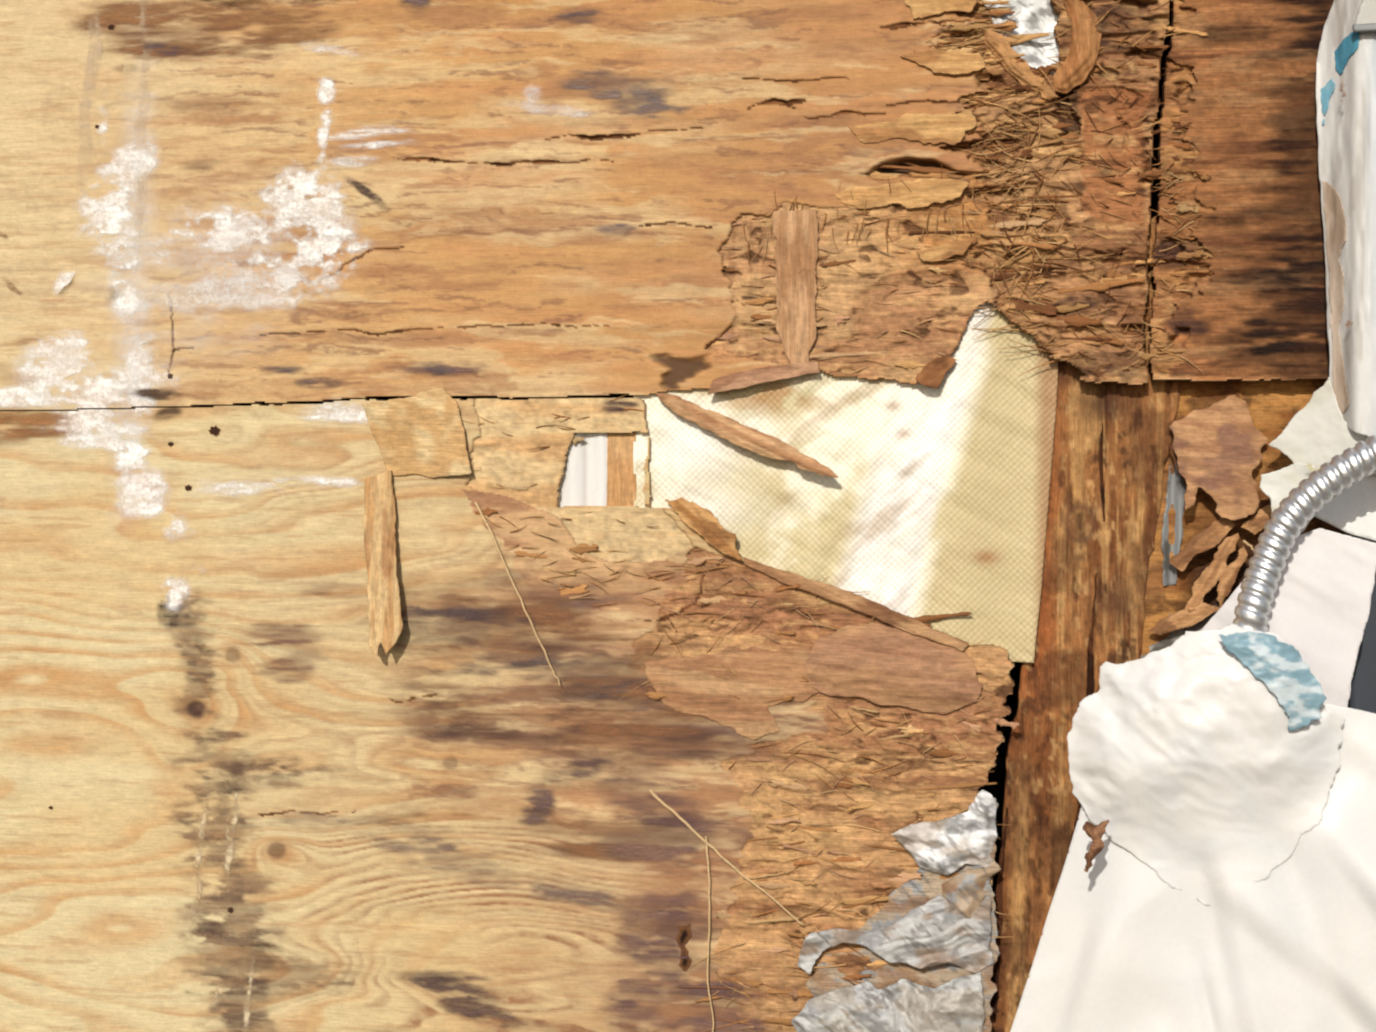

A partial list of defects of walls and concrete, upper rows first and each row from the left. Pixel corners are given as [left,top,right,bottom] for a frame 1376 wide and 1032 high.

water stain [167,79,404,306]
crack [398,128,704,167]
peeling [706,164,1226,383]
peeling [926,0,1056,104]
water stain [1230,72,1330,374]
water stain [1280,0,1334,50]
water stain [0,335,185,533]
peeling [461,393,723,612]
water stain [401,594,737,861]
peeling [914,612,972,626]
peeling [959,718,1020,734]
water stain [177,758,323,1032]